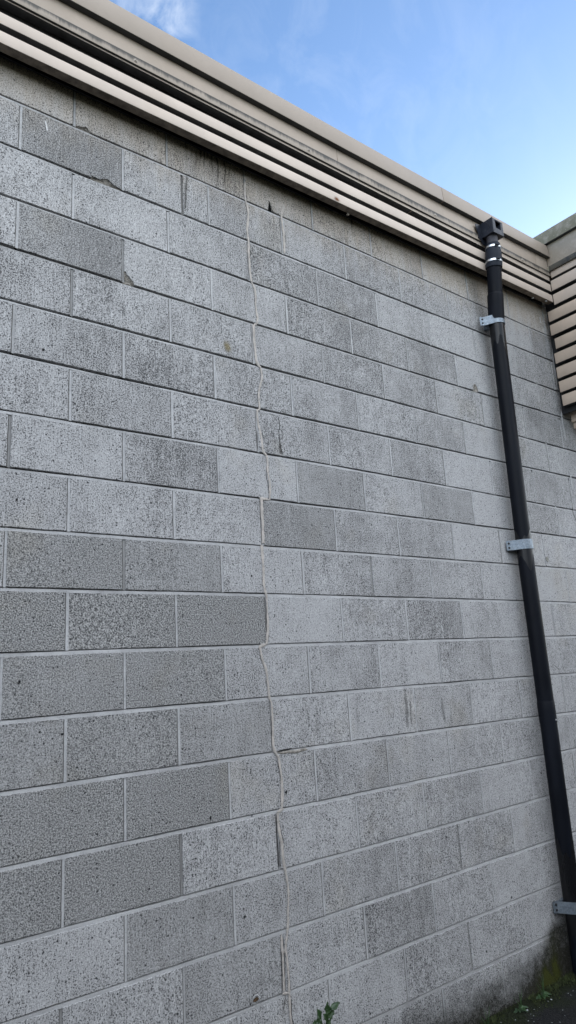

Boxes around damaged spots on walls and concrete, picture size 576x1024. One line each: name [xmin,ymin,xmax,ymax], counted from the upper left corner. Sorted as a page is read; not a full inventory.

crack [243,170,294,1024]